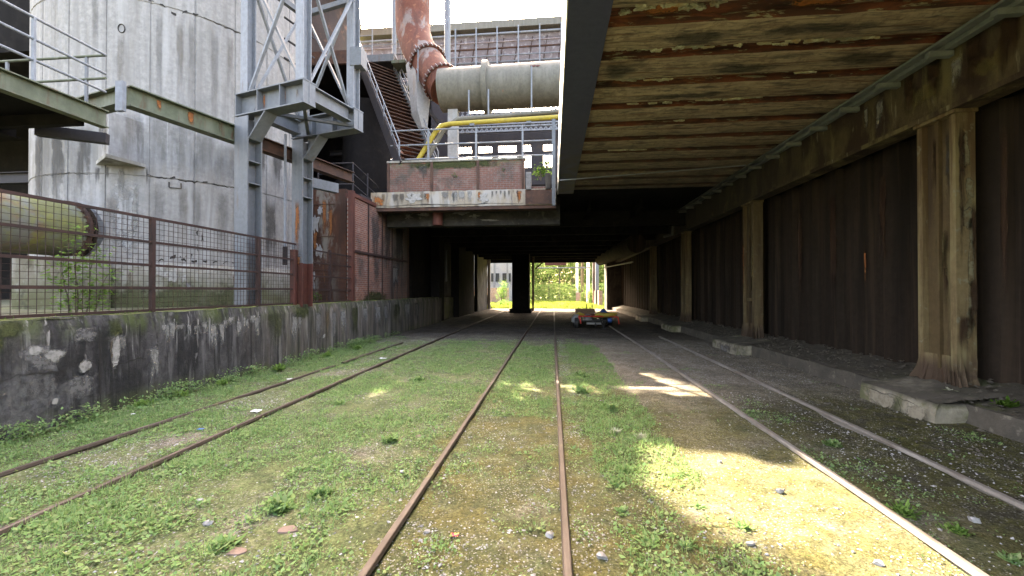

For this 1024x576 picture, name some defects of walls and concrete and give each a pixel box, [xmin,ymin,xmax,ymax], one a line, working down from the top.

peeling [618,1,728,16]
peeling [607,43,743,53]
peeling [757,36,880,46]
water stain [35,137,63,195]
water stain [78,142,138,230]
spalling [75,328,95,342]
water stain [162,313,302,343]
water stain [316,303,419,339]
peeling [112,335,120,367]
water stain [151,349,159,372]